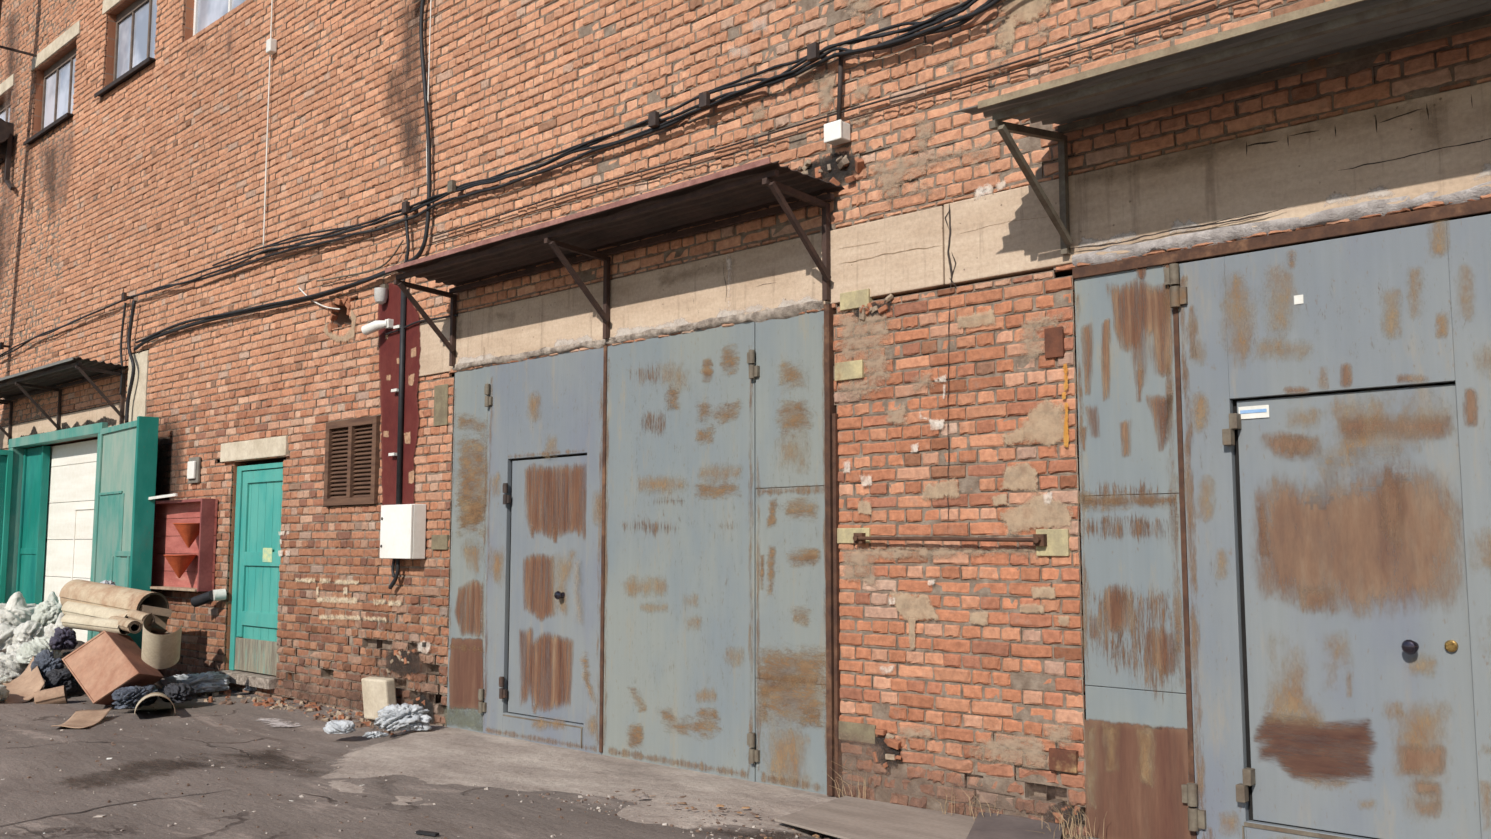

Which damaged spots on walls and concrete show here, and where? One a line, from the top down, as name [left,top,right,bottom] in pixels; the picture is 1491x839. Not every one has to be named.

crack [1070,207,1287,249]
rust [643,464,758,504]
crack [837,204,1048,527]
rust [1078,307,1212,589]
rust [1341,364,1351,386]
rust [1257,403,1459,611]
rust [1465,389,1477,424]
rust [444,417,676,747]
rust [1084,719,1204,839]
rust [1256,675,1374,782]